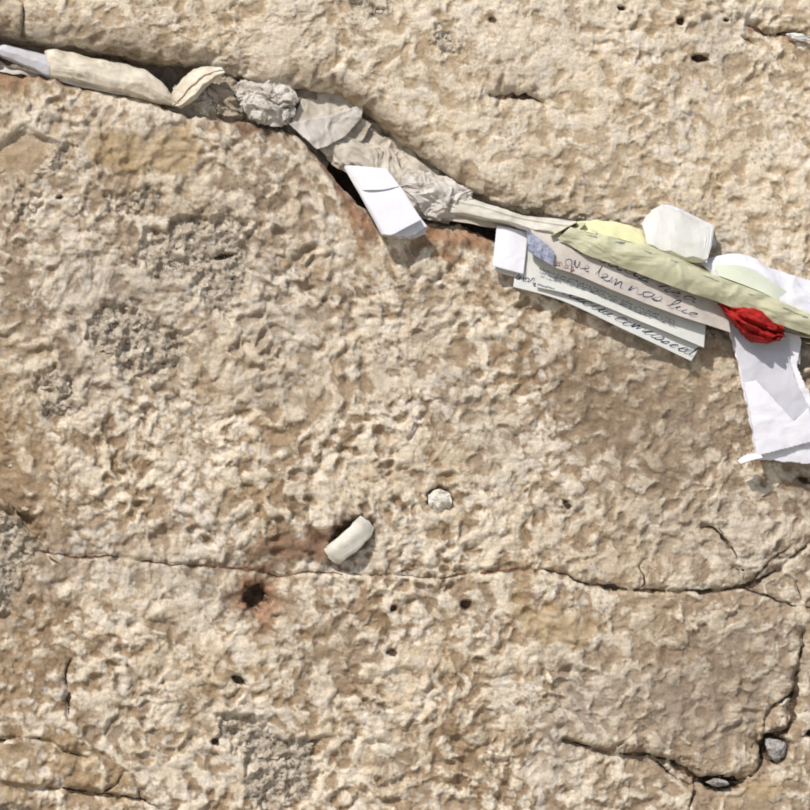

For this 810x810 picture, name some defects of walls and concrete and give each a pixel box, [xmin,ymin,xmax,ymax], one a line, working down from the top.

crack [744,25,788,44]
crack [41,551,118,565]
crack [140,560,373,577]
crack [394,568,518,579]
crack [543,526,810,608]
crack [64,661,72,715]
crack [562,633,805,810]
crack [48,773,157,807]